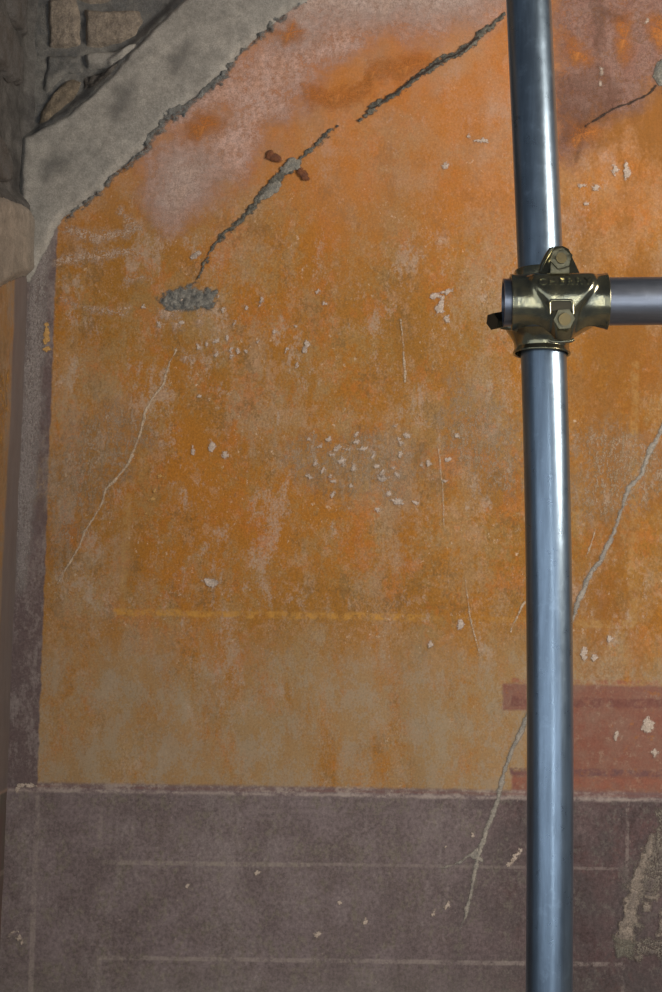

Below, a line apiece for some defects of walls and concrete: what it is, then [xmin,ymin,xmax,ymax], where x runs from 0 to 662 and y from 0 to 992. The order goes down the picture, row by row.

crack [196,12,506,280]
crack [585,85,657,127]
spalling [157,283,225,328]
peeling [183,335,247,361]
crack [57,348,177,584]
crack [573,425,662,620]
crack [440,714,527,927]
peeling [614,810,662,962]